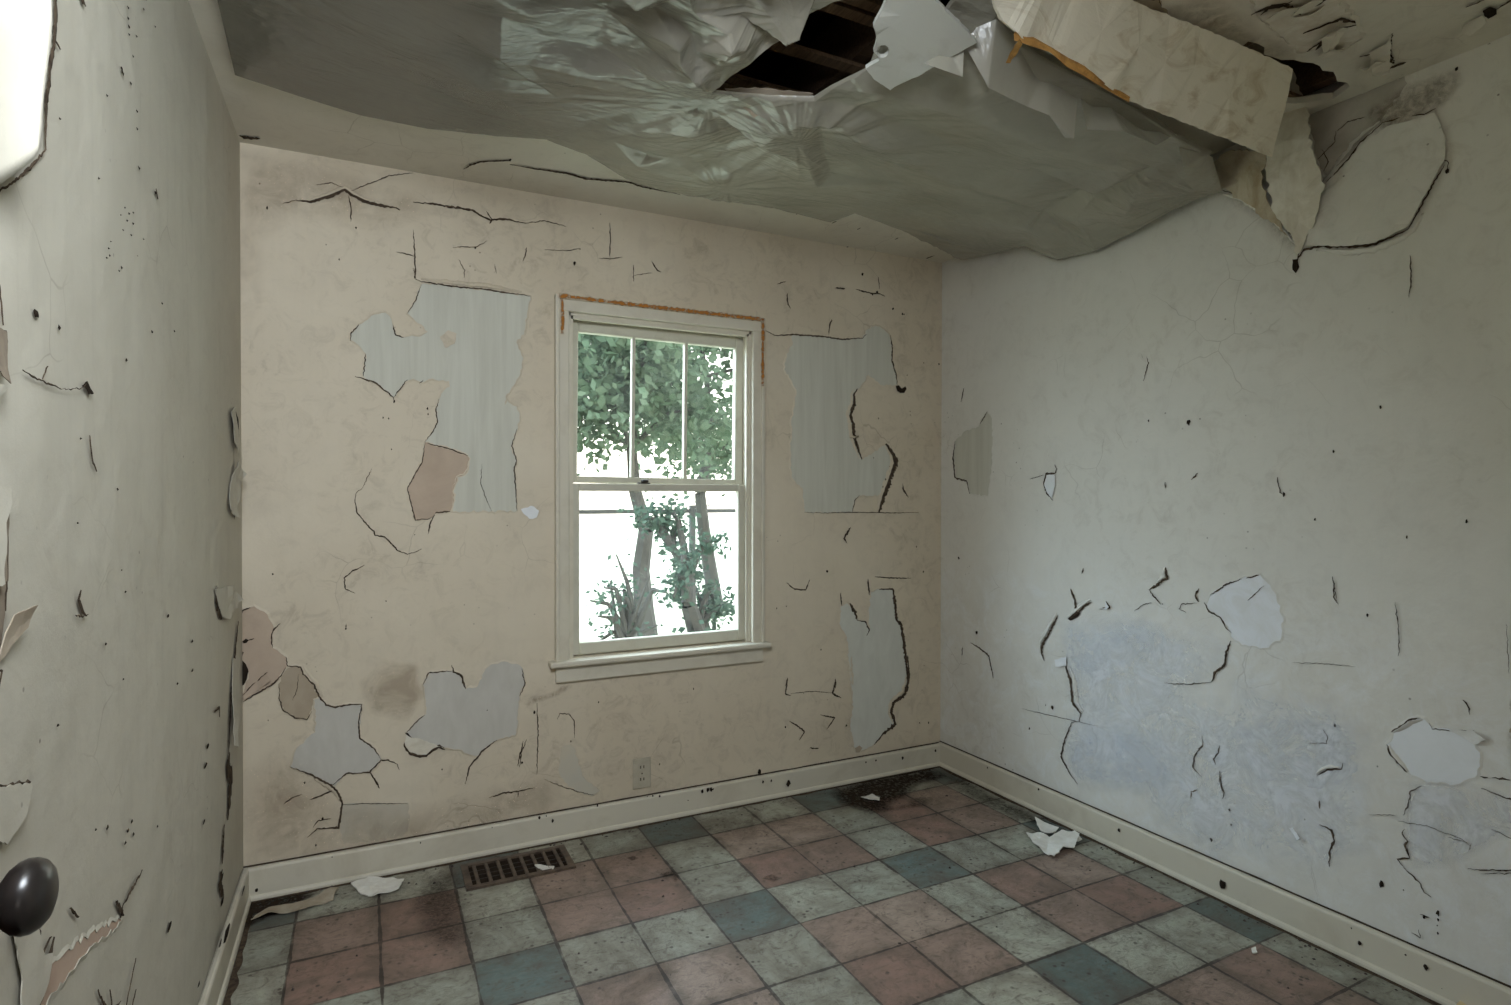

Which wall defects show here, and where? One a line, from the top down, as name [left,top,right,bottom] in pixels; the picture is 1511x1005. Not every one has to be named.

peeling [1133,0,1172,15]
crack [283,173,661,282]
crack [464,159,680,195]
peeling [0,286,12,397]
peeling [0,459,38,684]
peeling [838,580,910,763]
peeling [1179,573,1286,681]
peeling [0,779,33,845]
flaking render [1035,817,1059,833]
peeling [1384,700,1511,860]
peeling [14,870,143,1005]
crack [98,958,137,1005]